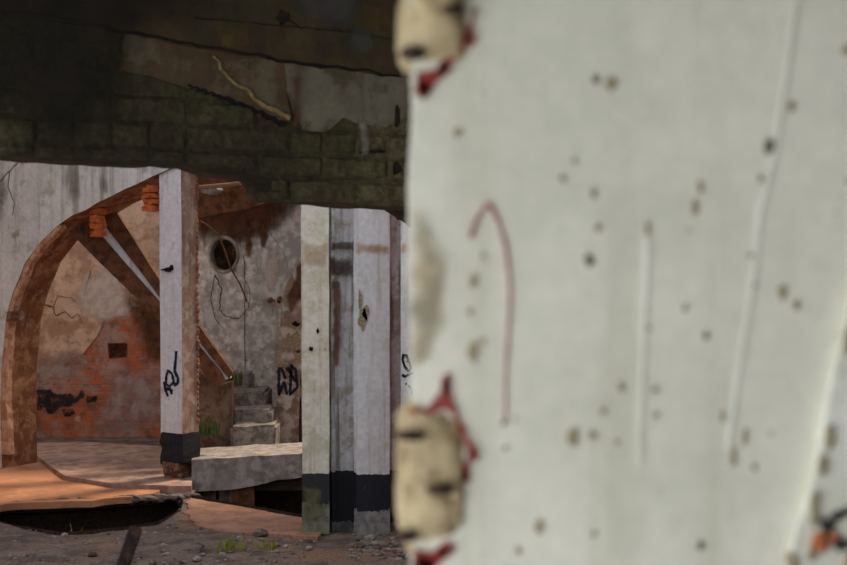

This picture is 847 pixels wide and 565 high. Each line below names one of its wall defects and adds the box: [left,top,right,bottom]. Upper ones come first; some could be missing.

flaking render [119,34,291,127]
crack [125,31,410,79]
spalling [396,0,477,100]
crack [0,162,19,216]
crack [44,271,91,325]
spalling [393,221,478,565]
spalling [566,427,578,447]